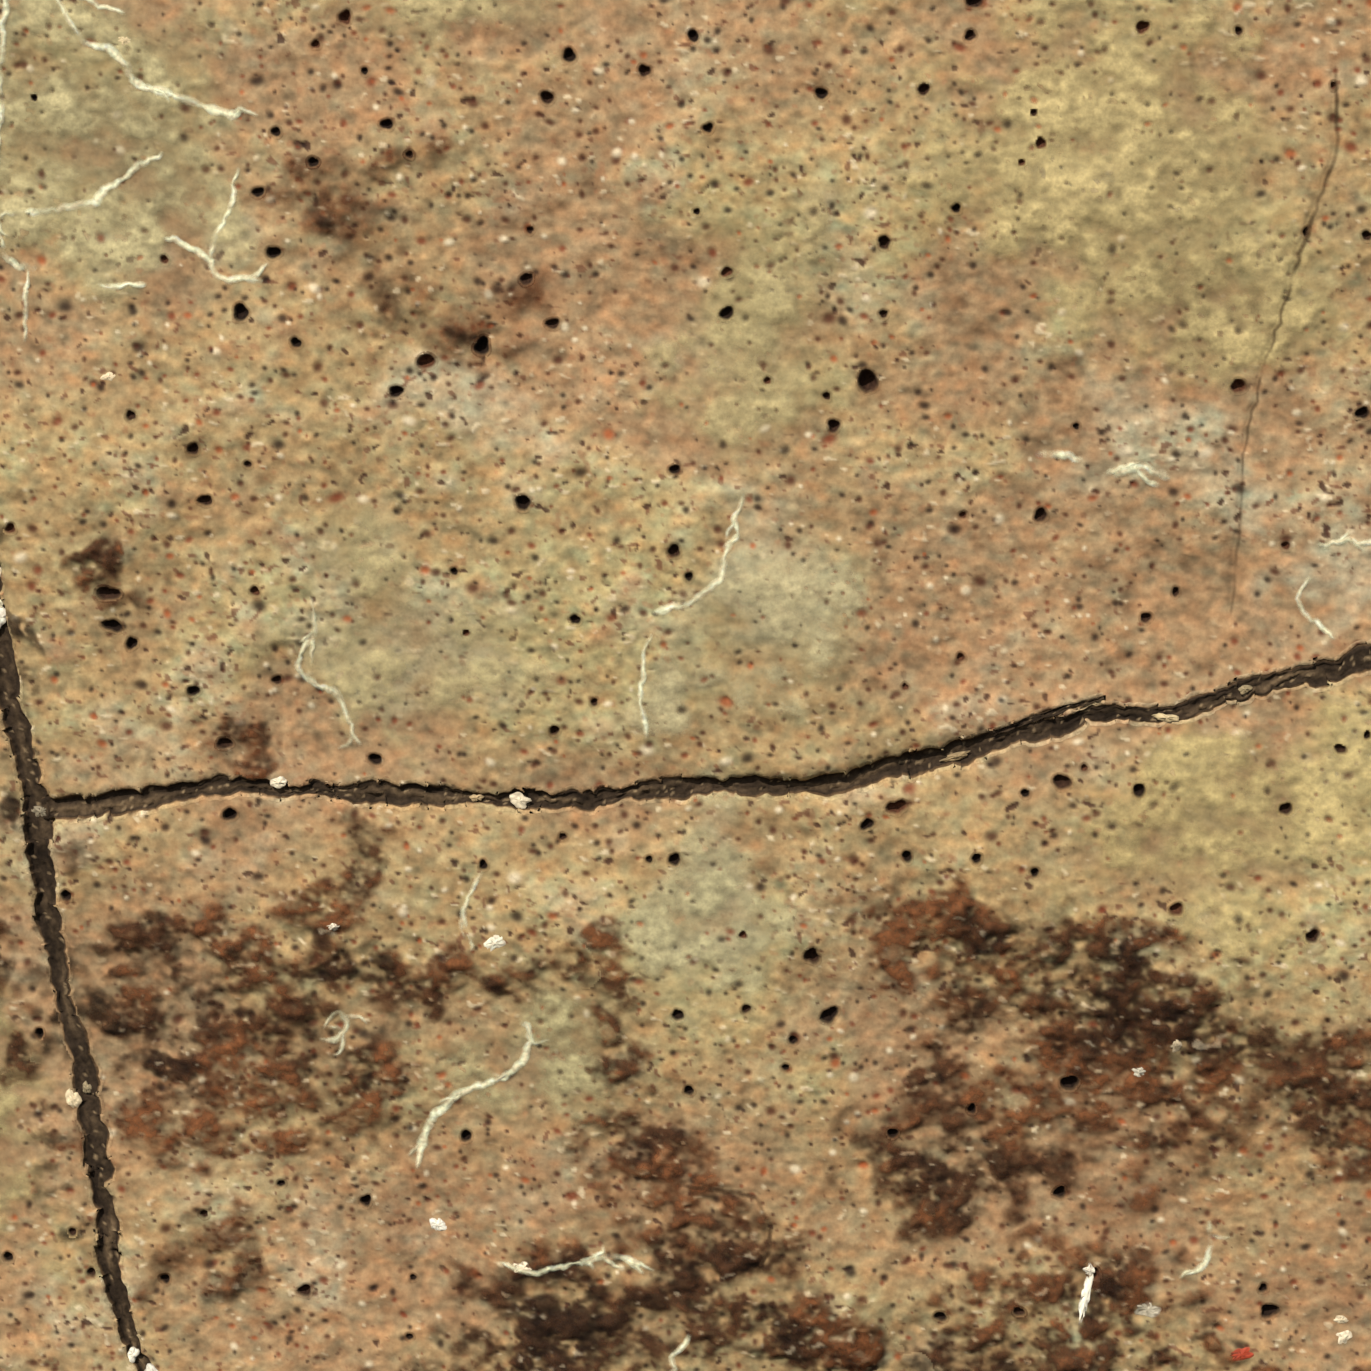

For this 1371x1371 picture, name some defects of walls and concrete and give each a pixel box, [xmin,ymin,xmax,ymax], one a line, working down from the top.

crack [1055,452,1077,461]
crack [1110,462,1165,486]
crack [656,501,742,614]
water stain [1088,705,1371,874]
crack [0,528,1371,1371]
water stain [1177,895,1255,957]
water stain [521,990,619,1107]